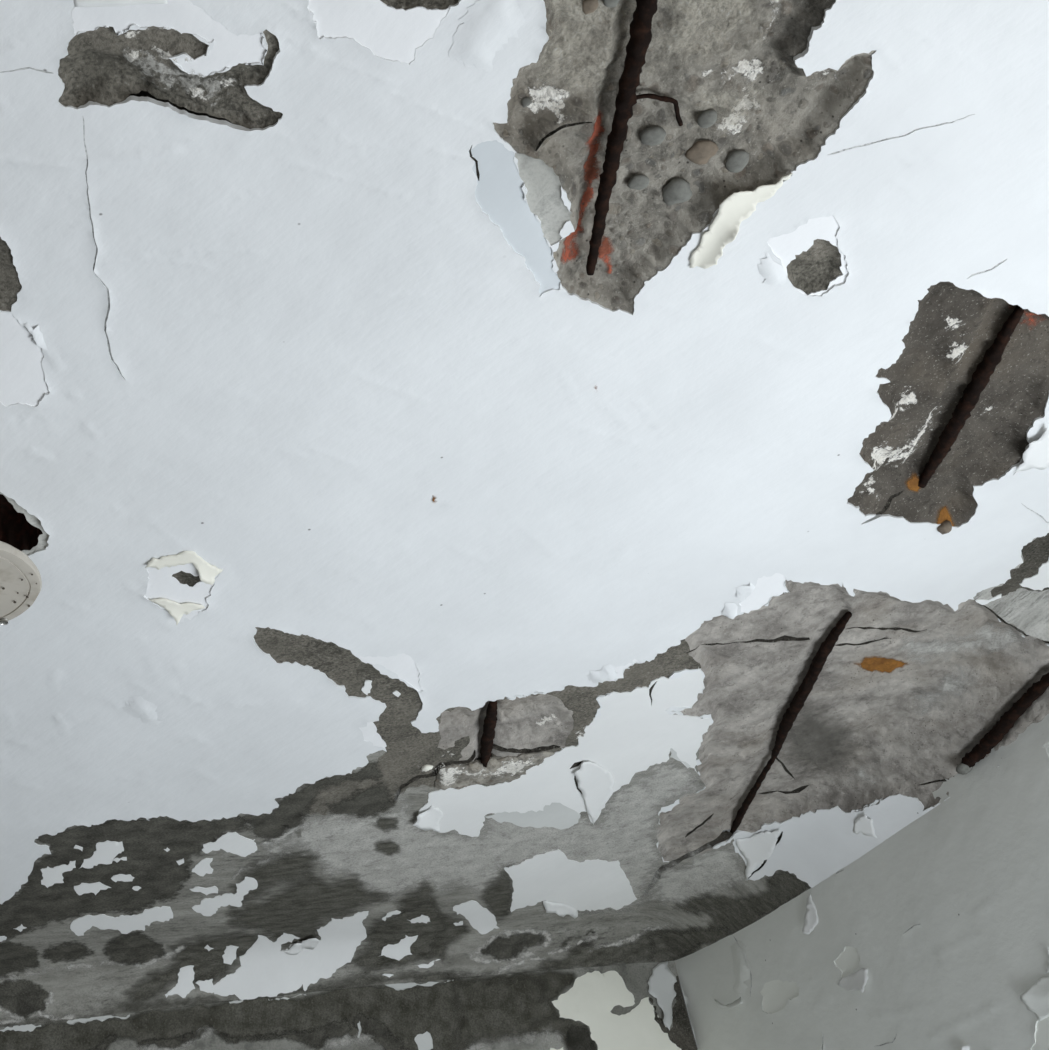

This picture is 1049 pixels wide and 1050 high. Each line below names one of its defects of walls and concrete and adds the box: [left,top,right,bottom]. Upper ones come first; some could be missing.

spalling [58,26,283,129]
peeling [0,237,22,311]
crack [83,118,122,375]
corrosion [561,115,605,262]
corrosion [598,237,612,274]
spalling [493,0,876,313]
spalling [848,281,1049,527]
corrosion [906,474,920,492]
corrosion [855,656,907,673]
leakage [422,751,536,787]
peeling [0,533,1049,1050]
leakage [0,762,810,1050]